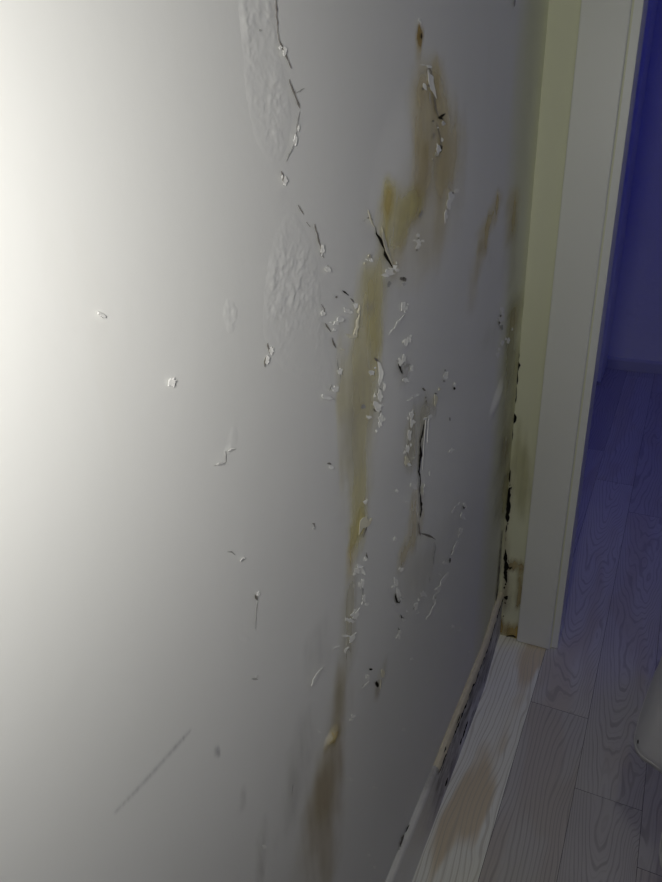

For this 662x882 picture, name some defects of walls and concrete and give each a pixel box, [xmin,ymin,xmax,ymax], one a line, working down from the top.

crack [363,210,400,287]
peeling [361,358,386,433]
crack [404,388,441,581]
crack [495,530,503,600]
water stain [503,471,523,607]